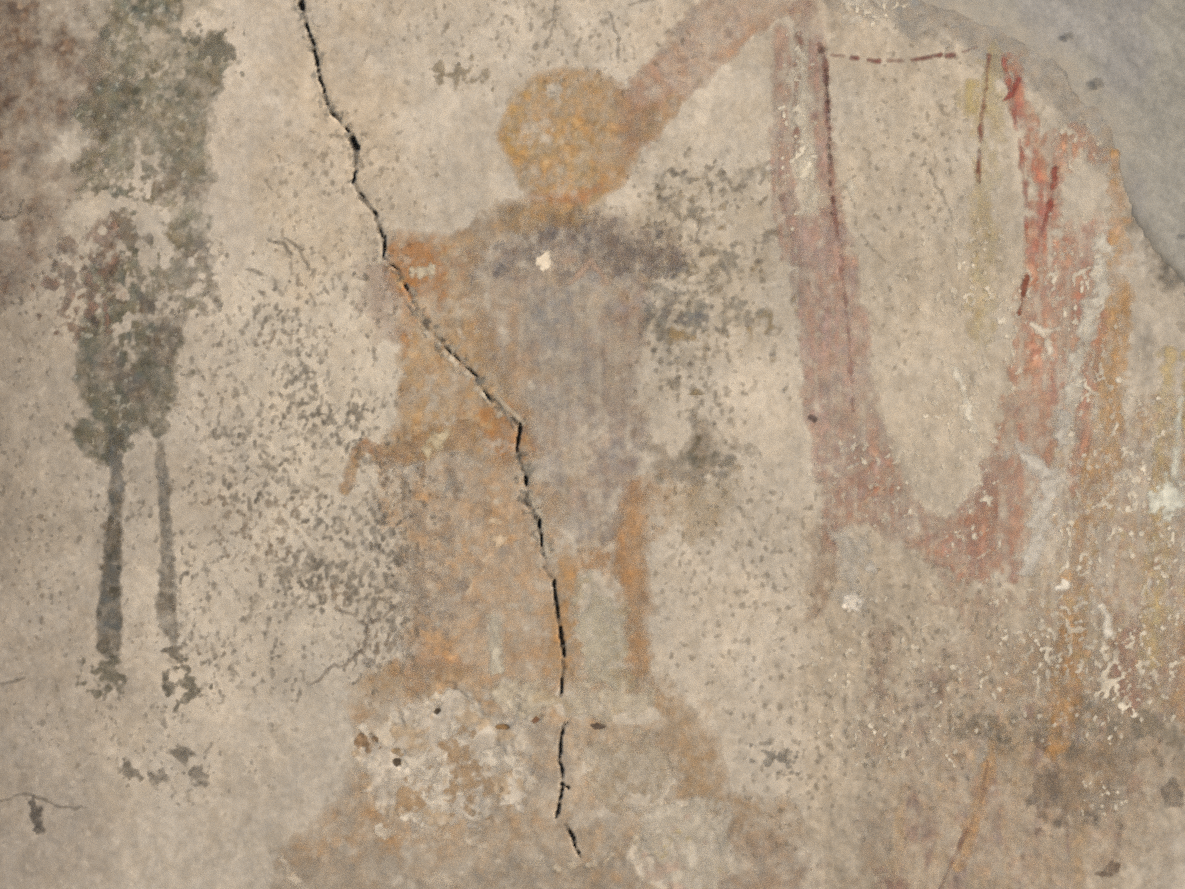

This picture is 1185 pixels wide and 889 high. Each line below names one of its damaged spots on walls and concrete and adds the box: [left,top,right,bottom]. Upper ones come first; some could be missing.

crack [294,0,565,695]
peeling [777,45,818,230]
peeling [812,208,1185,767]
crack [556,727,581,857]